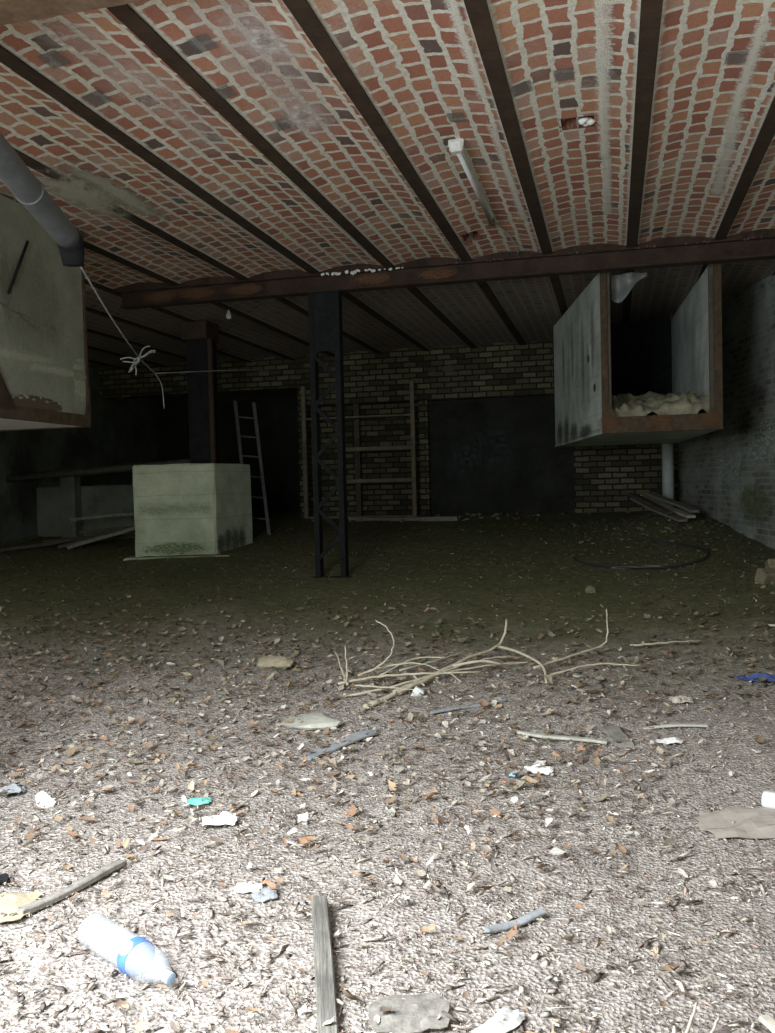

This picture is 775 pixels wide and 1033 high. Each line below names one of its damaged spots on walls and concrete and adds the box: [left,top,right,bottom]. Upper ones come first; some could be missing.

leakage [593,0,616,215]